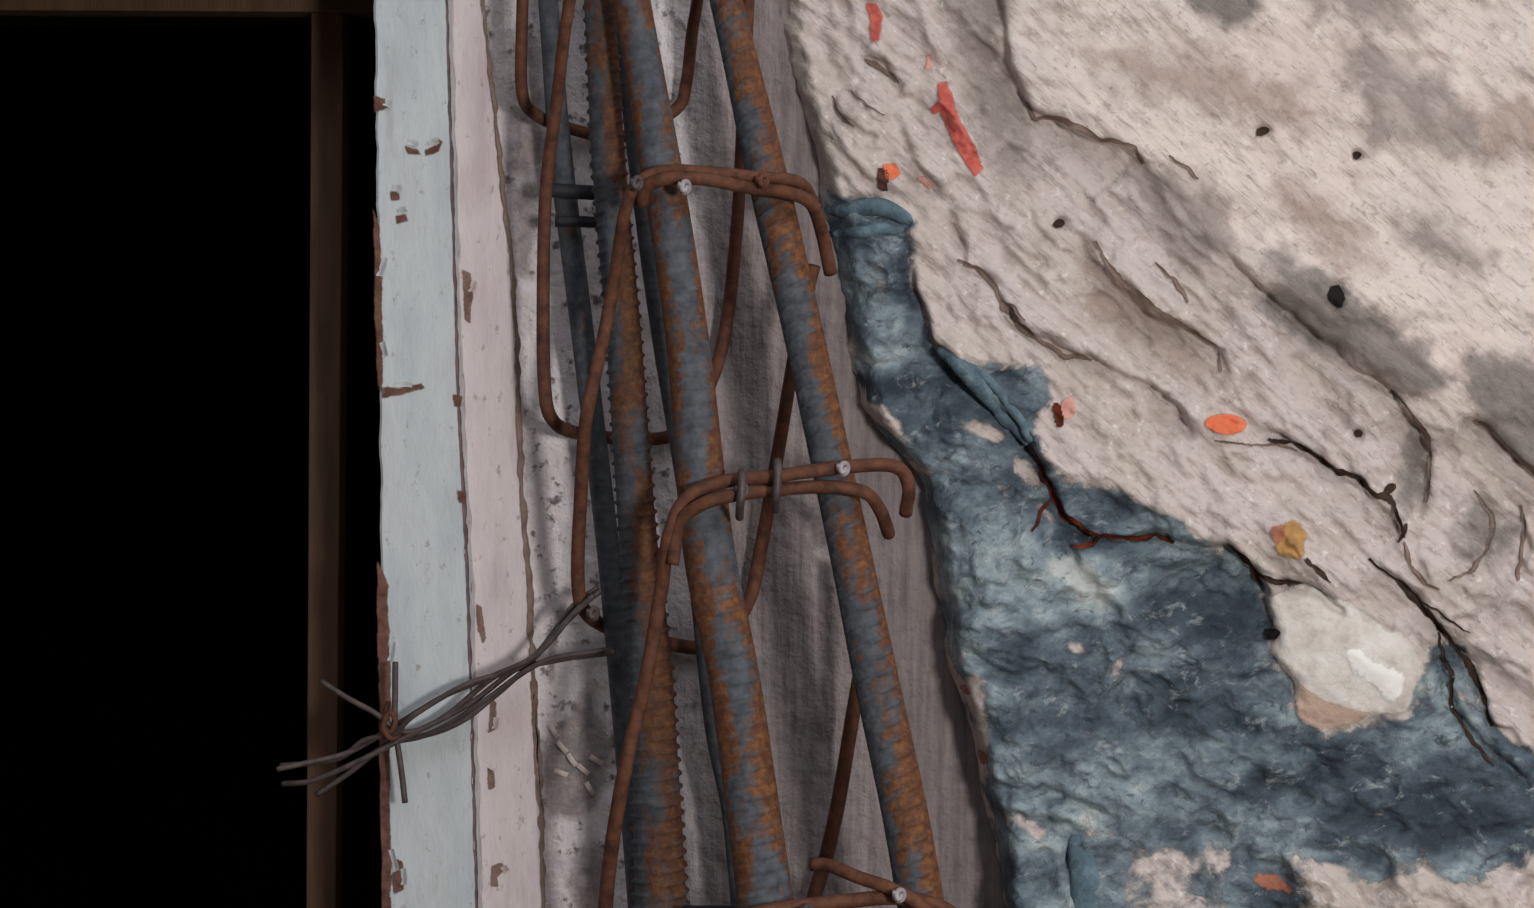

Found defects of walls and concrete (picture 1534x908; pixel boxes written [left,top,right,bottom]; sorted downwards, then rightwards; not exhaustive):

peeling [374,96,393,112]
peeling [405,138,443,155]
spalling [512,44,543,271]
peeling [373,184,424,398]
flaking render [462,270,477,323]
spalling [1327,285,1345,308]
crack [1030,447,1175,549]
spalling [805,508,832,569]
flaking render [1265,584,1422,732]
spalling [543,695,611,816]
flaking render [491,863,510,887]
spalling [571,848,602,908]